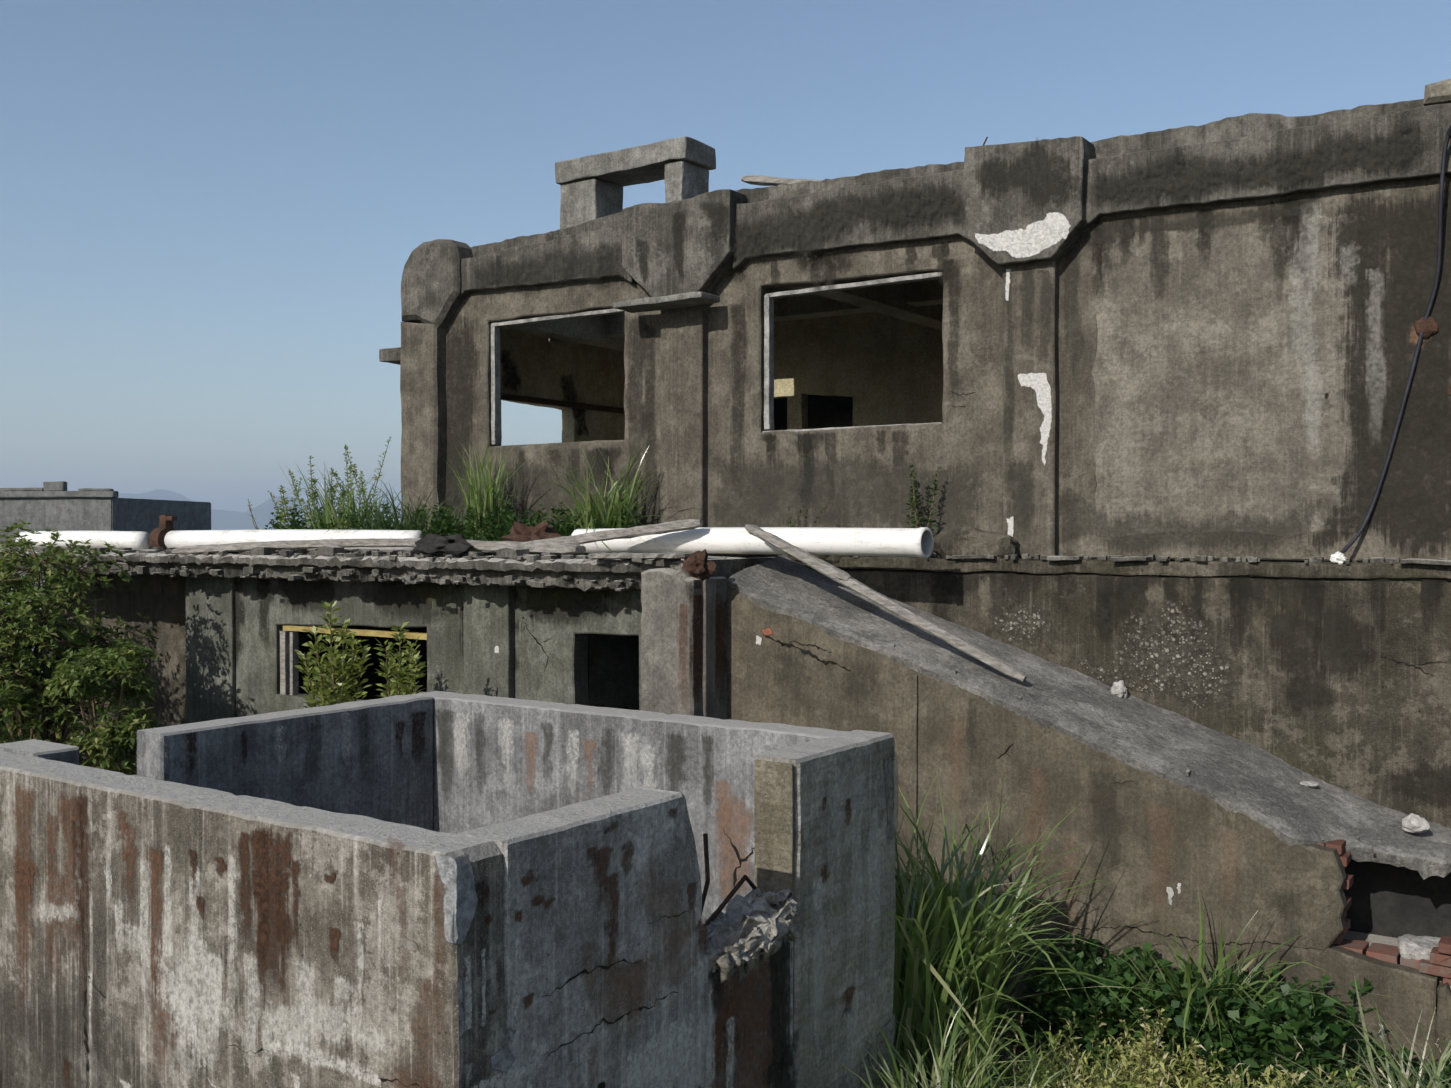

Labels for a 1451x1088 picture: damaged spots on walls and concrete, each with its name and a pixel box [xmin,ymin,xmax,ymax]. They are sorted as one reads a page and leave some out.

water stain [702,179,965,283]
peeling [975,212,1071,301]
water stain [976,120,1426,330]
peeling [1017,372,1052,466]
water stain [1313,184,1451,557]
crack [764,635,850,671]
rust [13,787,80,968]
rust [118,811,176,1049]
rust [214,827,301,999]
spalling [435,854,492,945]
crack [541,959,644,998]
crack [547,988,688,1057]